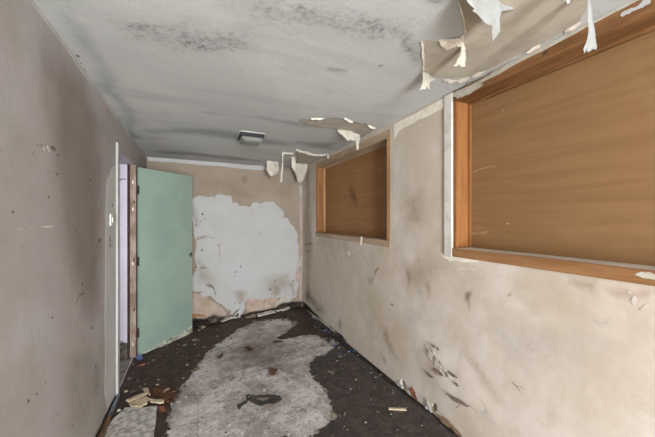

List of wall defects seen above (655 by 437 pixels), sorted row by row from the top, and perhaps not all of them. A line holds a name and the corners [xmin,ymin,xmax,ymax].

peeling [192,186,303,320]
peeling [636,272,655,280]
flaking render [426,345,459,387]